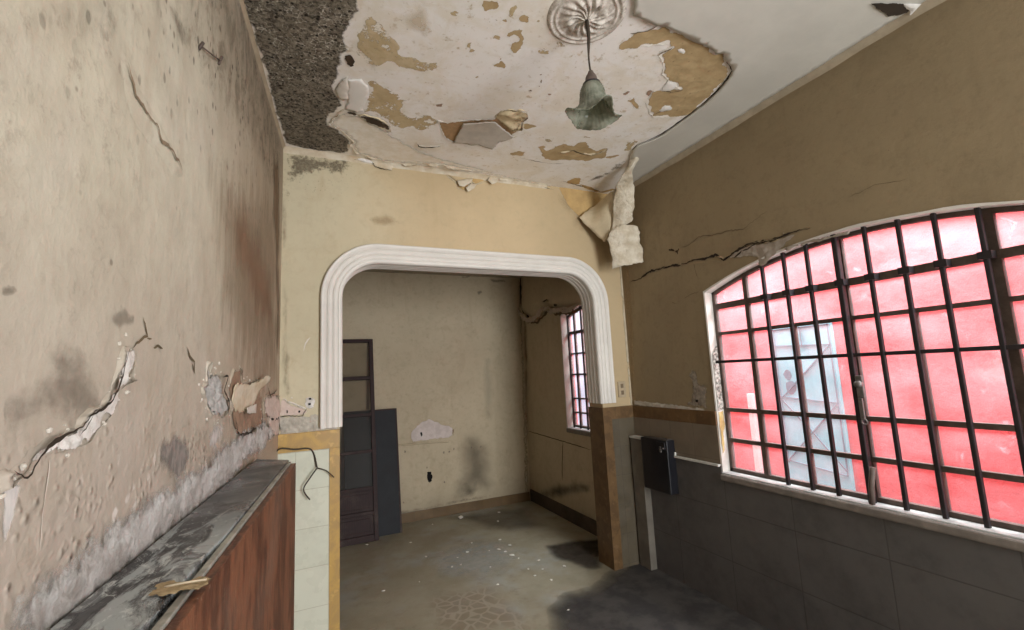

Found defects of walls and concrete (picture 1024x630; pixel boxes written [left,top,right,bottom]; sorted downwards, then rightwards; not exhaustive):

flaking render [357,17,437,72]
flaking render [482,1,540,53]
crack [128,63,182,167]
peeling [329,77,536,192]
peeling [538,0,926,182]
peeling [558,178,616,220]
crack [632,211,810,304]
peeling [198,360,337,438]
leakage [3,486,19,537]
efflorescence [18,423,273,630]
leakage [549,540,599,568]
leakage [553,564,770,630]